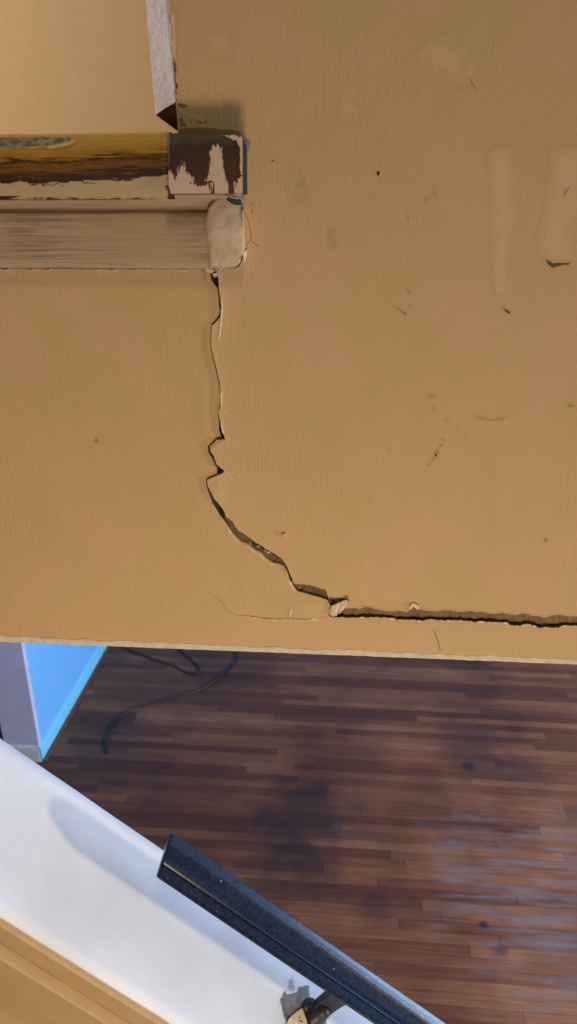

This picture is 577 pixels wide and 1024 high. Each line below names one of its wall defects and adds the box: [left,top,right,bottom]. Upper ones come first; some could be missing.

peeling [0,134,252,199]
crack [206,197,577,652]